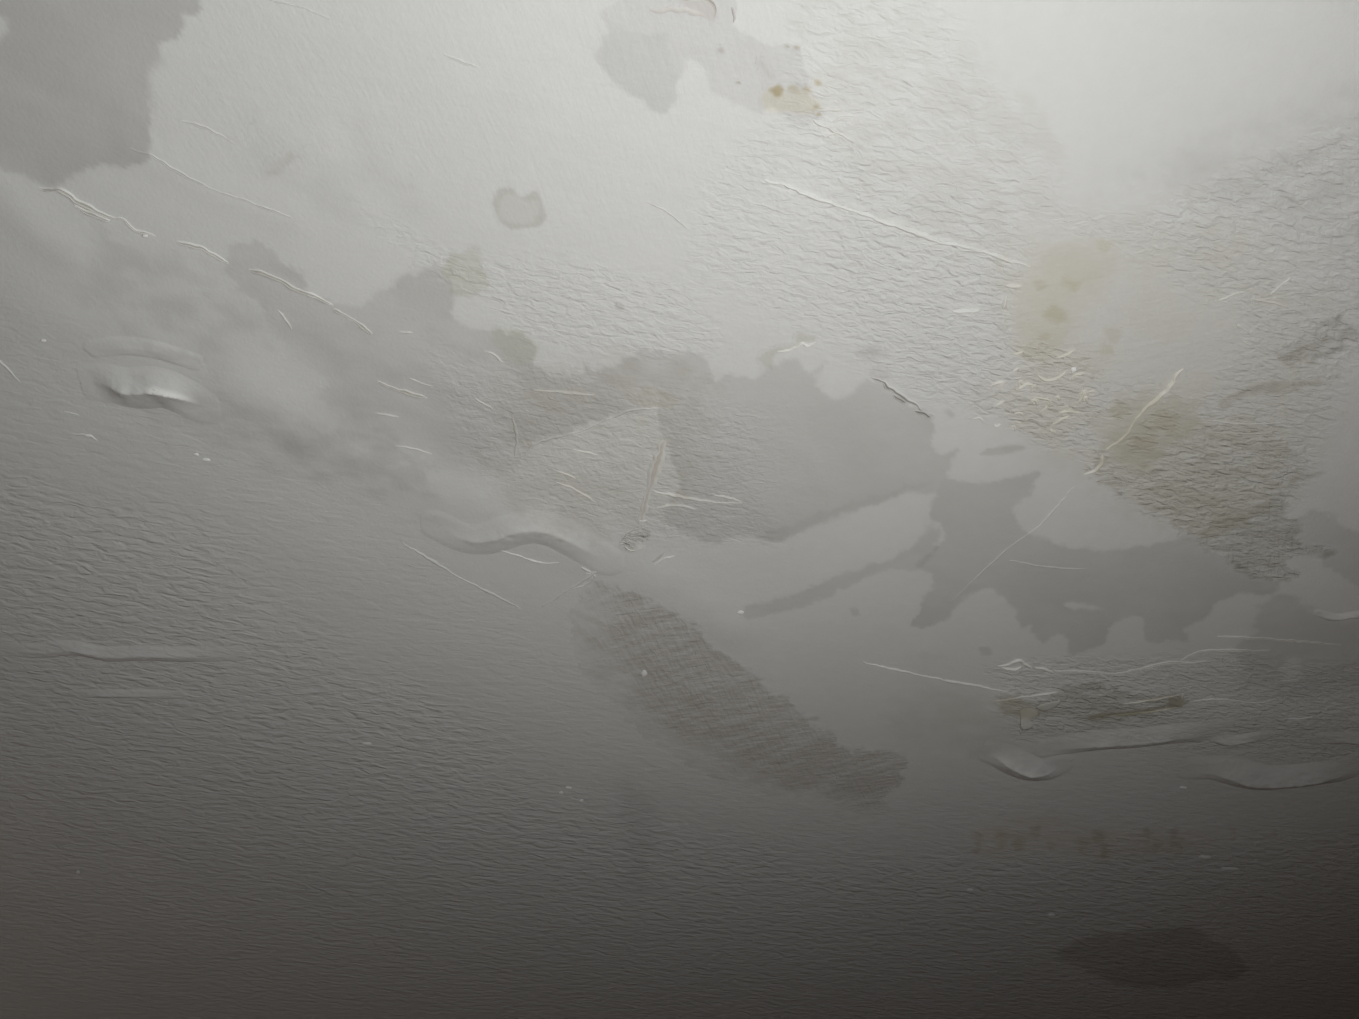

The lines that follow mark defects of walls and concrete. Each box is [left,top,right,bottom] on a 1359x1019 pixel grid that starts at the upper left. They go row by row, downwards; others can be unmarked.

leakage [0,0,206,196]
leakage [220,231,1359,714]
crack [870,376,934,418]
leakage [1049,922,1253,990]